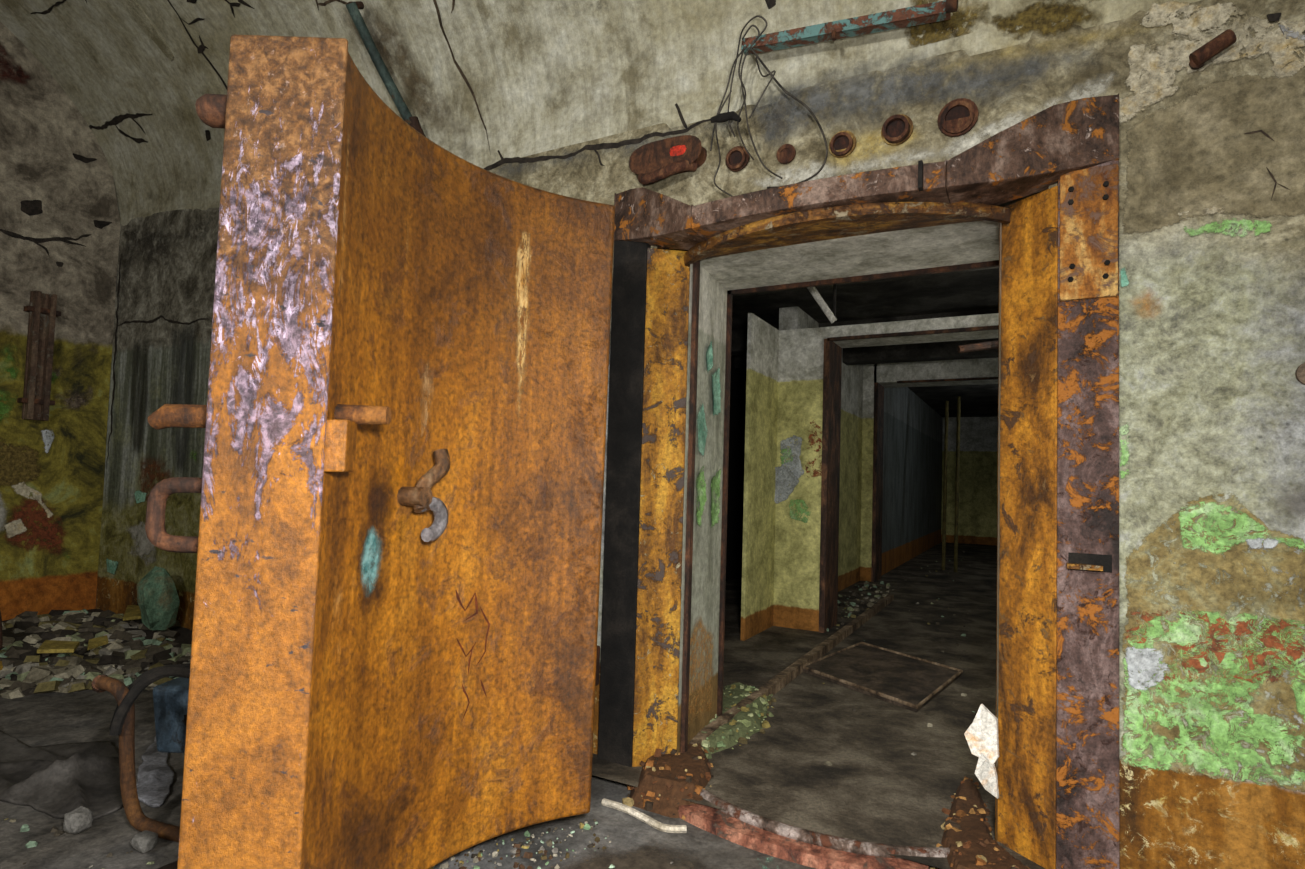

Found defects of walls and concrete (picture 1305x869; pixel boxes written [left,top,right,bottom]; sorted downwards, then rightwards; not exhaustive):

crack [89,113,152,143]
crack [167,0,254,89]
crack [315,0,348,11]
crack [433,0,710,170]
corrosion [835,134,913,165]
flaking render [1119,1,1305,122]
crack [0,229,92,255]
crack [106,253,208,468]
peeling [41,430,54,453]
corrosion [688,621,713,721]
peeling [1121,493,1305,792]